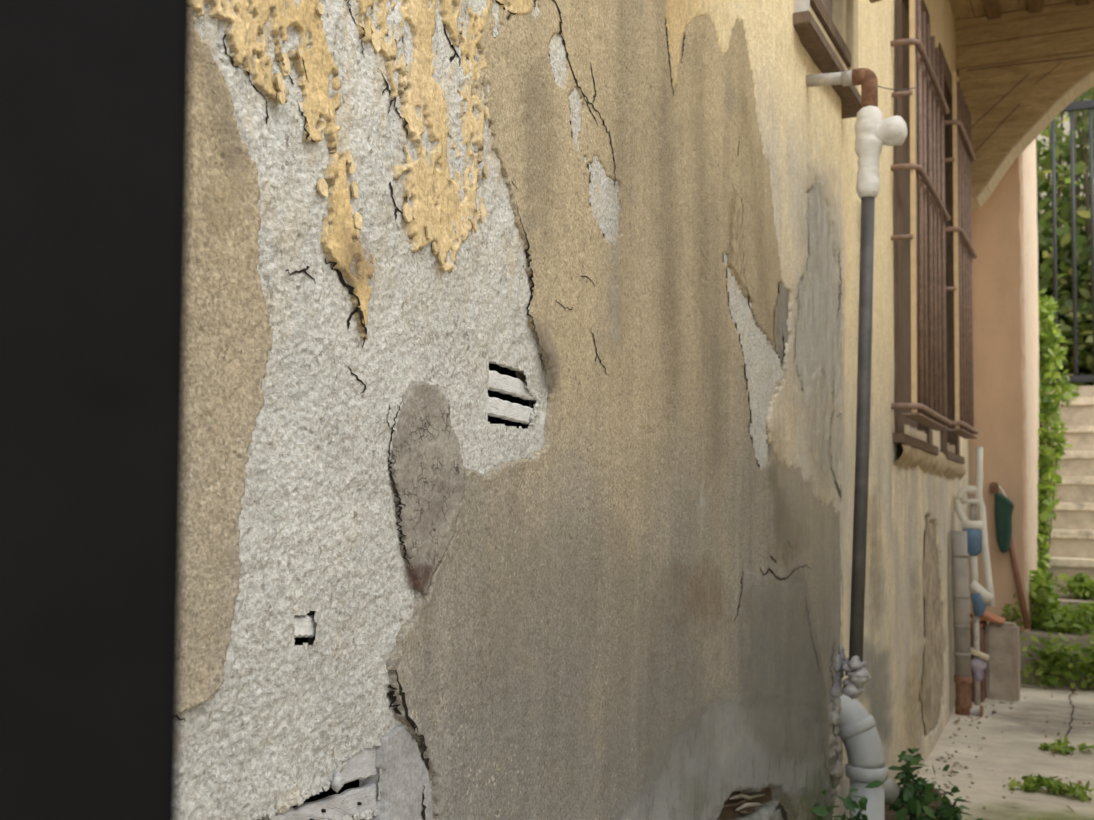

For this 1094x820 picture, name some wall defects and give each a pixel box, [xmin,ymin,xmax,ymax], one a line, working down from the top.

crack [495,0,616,188]
crack [285,258,367,394]
peeling [177,0,843,820]
crack [387,396,409,570]
crack [734,540,835,685]
crack [387,670,431,820]
damp [621,700,828,820]
crack [770,798,787,820]
crack [1067,688,1075,735]